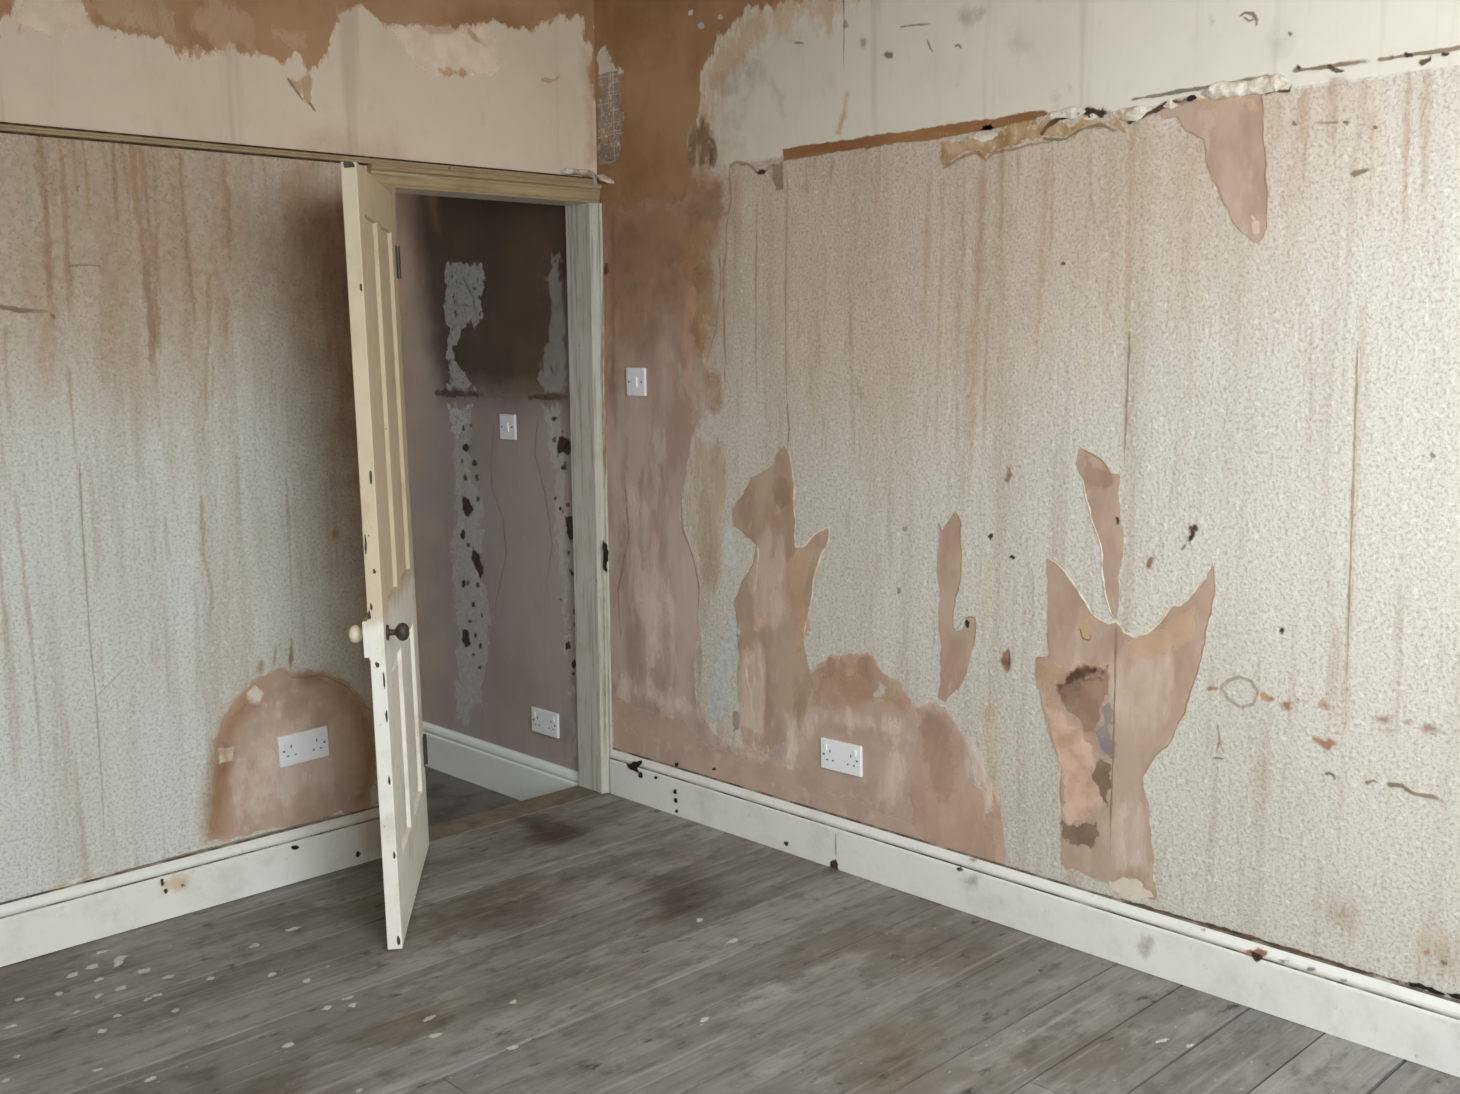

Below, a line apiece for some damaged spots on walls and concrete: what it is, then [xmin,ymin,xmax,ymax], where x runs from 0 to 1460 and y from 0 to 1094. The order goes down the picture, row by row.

flaking render [0,0,13,19]
spalling [940,73,1291,166]
water stain [0,136,126,341]
water stain [128,142,251,300]
water stain [604,181,722,351]
flaking render [75,0,1005,871]
peeling [1001,650,1011,672]
water stain [209,704,246,830]
peeling [1040,661,1115,848]
peeling [1109,877,1153,901]